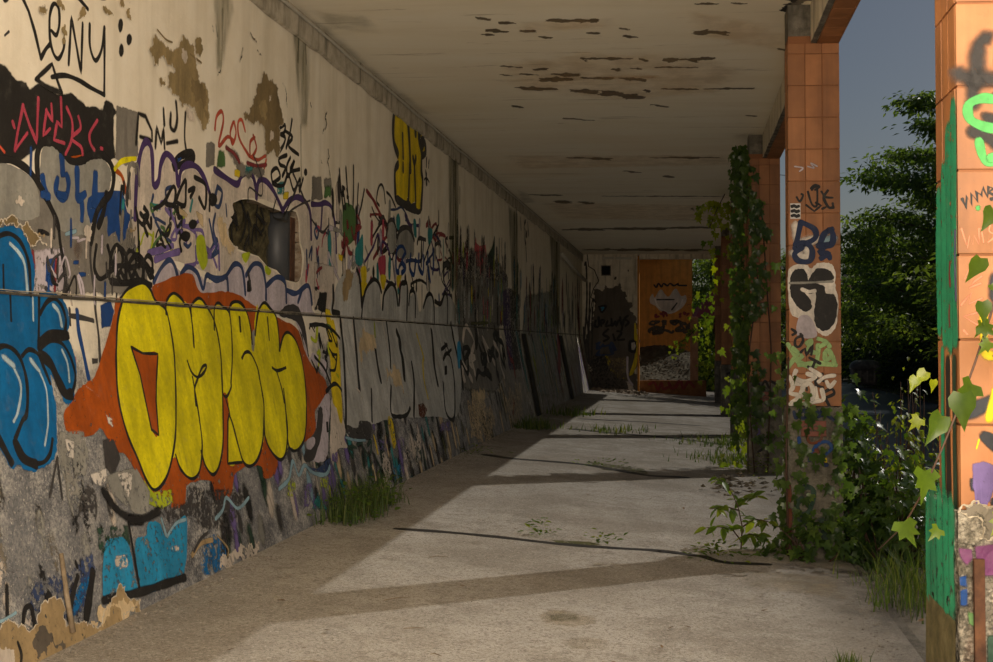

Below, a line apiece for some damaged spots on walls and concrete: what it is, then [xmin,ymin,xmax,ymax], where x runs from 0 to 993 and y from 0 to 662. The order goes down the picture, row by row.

peeling [475,17,553,39]
peeling [546,18,600,34]
spalling [811,0,835,43]
peeling [149,29,210,131]
peeling [500,57,754,108]
peeling [244,71,284,159]
spalling [217,199,302,282]
peeling [91,469,133,497]
spalling [957,500,993,541]
flaking render [0,583,141,662]